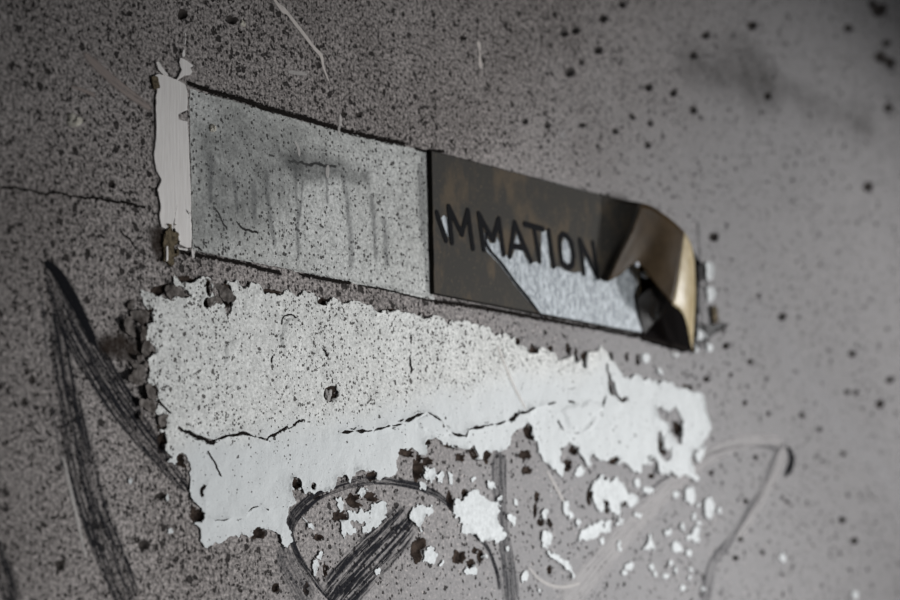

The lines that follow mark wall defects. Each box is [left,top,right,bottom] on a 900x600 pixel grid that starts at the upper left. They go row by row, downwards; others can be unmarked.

crack [2,186,146,209]
peeling [705,262,716,302]
peeling [693,329,730,353]
peeling [124,275,722,579]
crack [343,396,606,437]
crack [158,399,304,497]
peeling [302,517,328,595]